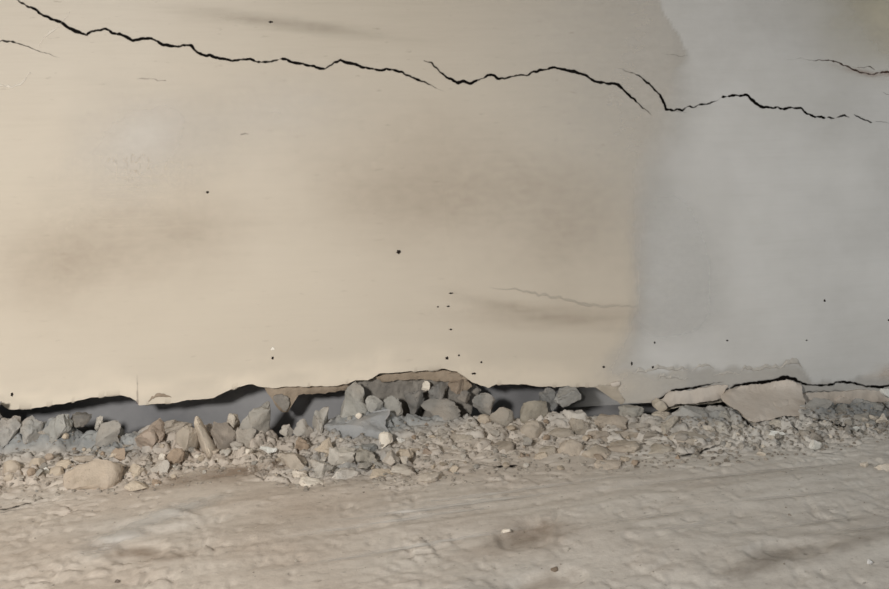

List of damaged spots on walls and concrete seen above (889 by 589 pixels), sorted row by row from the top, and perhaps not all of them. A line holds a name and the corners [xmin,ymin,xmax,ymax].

crack [18,0,872,123]
crack [826,60,889,75]
spalling [264,369,481,418]
flaking render [720,379,806,436]
crack [659,376,889,432]